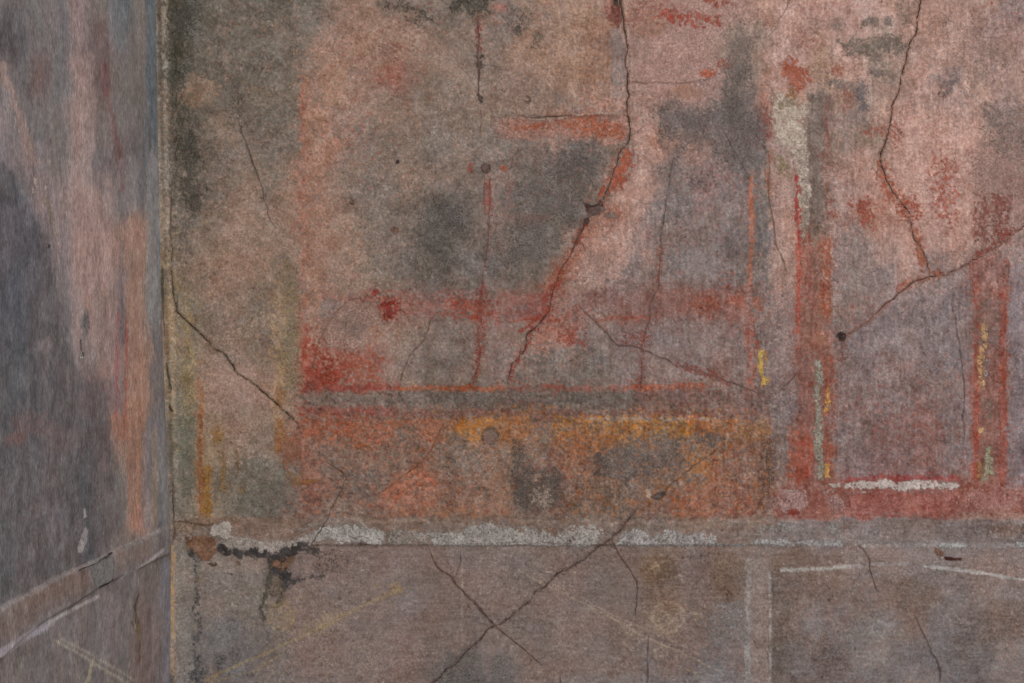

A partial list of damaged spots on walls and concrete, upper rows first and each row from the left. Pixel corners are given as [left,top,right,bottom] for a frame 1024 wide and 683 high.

leakage [403,135,607,291]
crack [508,0,713,379]
crack [579,0,1024,412]
crack [161,191,304,437]
crack [170,480,178,541]
leakage [216,521,604,621]
crack [429,509,638,683]
crack [644,635,652,683]
leakage [615,524,844,548]